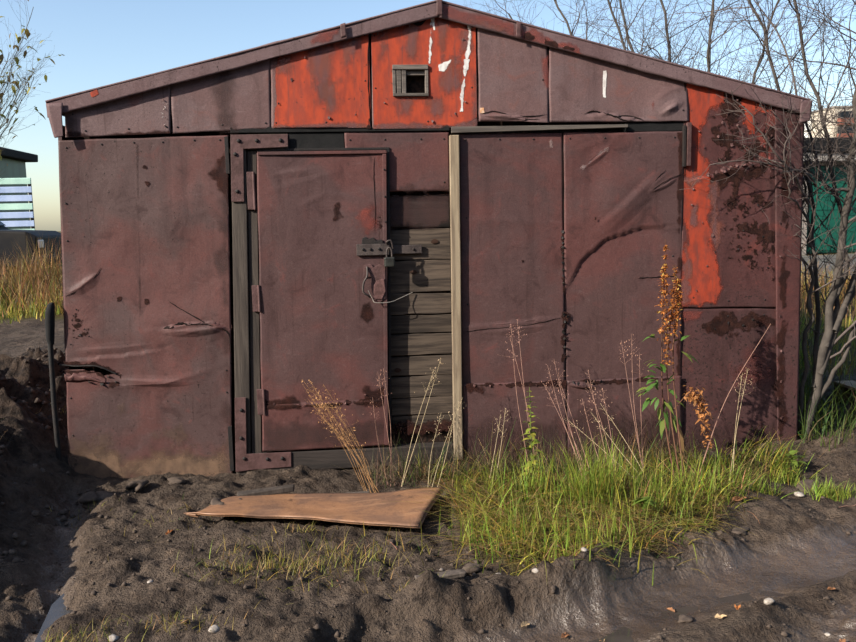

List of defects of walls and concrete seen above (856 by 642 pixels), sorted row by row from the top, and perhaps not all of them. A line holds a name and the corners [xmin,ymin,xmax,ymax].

rust [465,337,681,394]
peeling [681,83,775,320]
rust [701,96,791,436]